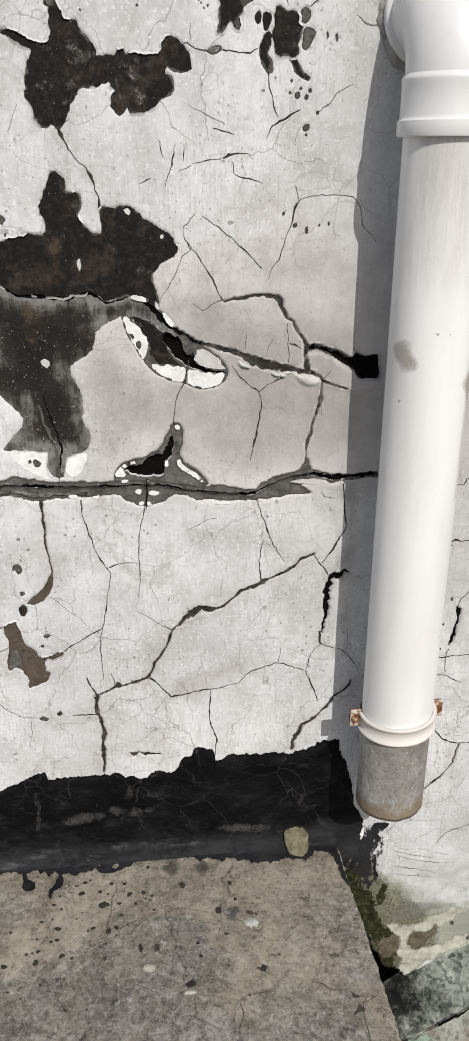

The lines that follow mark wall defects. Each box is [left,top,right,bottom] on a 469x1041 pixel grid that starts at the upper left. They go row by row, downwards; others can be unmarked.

spalling [0,0,192,130]
crack [142,24,354,185]
spalling [200,0,339,100]
crack [56,126,103,220]
spalling [0,171,379,509]
crack [160,185,379,460]
crack [10,502,74,615]
crack [64,478,355,772]
crack [437,592,469,682]
crack [424,706,469,789]
damp [315,740,469,967]
crack [390,824,469,877]